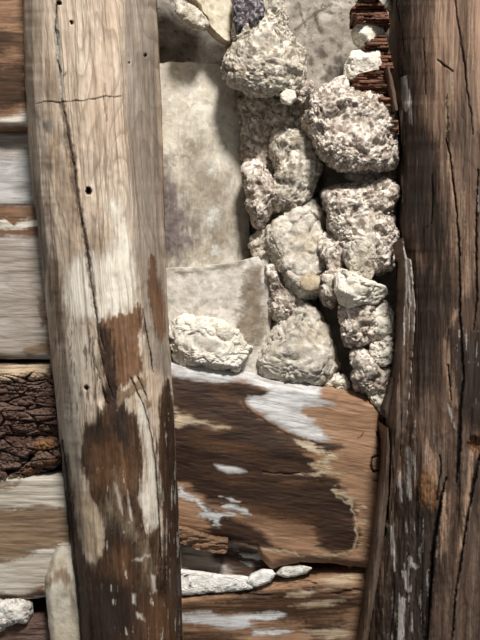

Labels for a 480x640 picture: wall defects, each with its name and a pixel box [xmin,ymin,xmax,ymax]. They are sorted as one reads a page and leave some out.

crack [423,3,473,128]
crack [425,97,480,640]